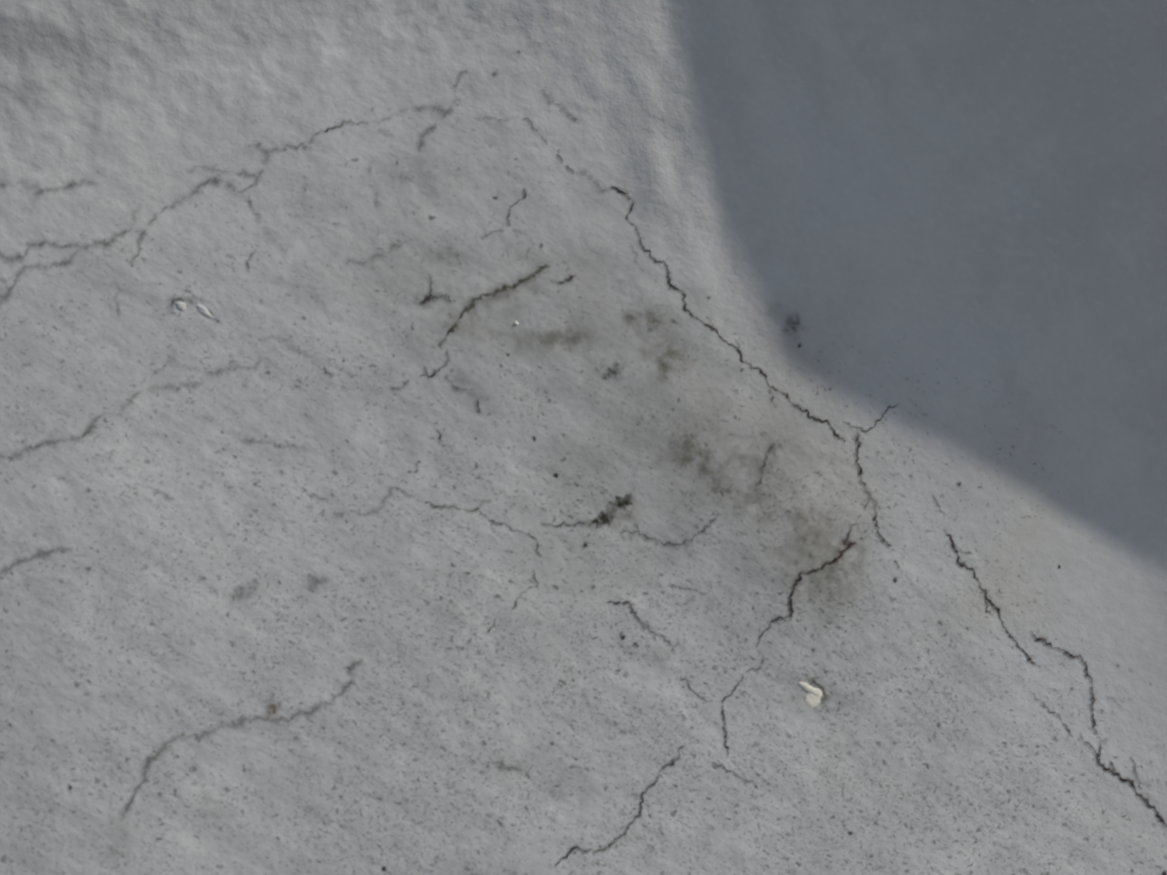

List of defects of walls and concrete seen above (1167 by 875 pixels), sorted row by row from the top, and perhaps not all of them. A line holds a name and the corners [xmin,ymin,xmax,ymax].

crack [6,242,70,297]
crack [412,265,573,413]
crack [524,92,899,782]
crack [425,502,602,629]
crack [947,534,1165,824]
crack [126,753,160,811]
crack [555,746,685,866]